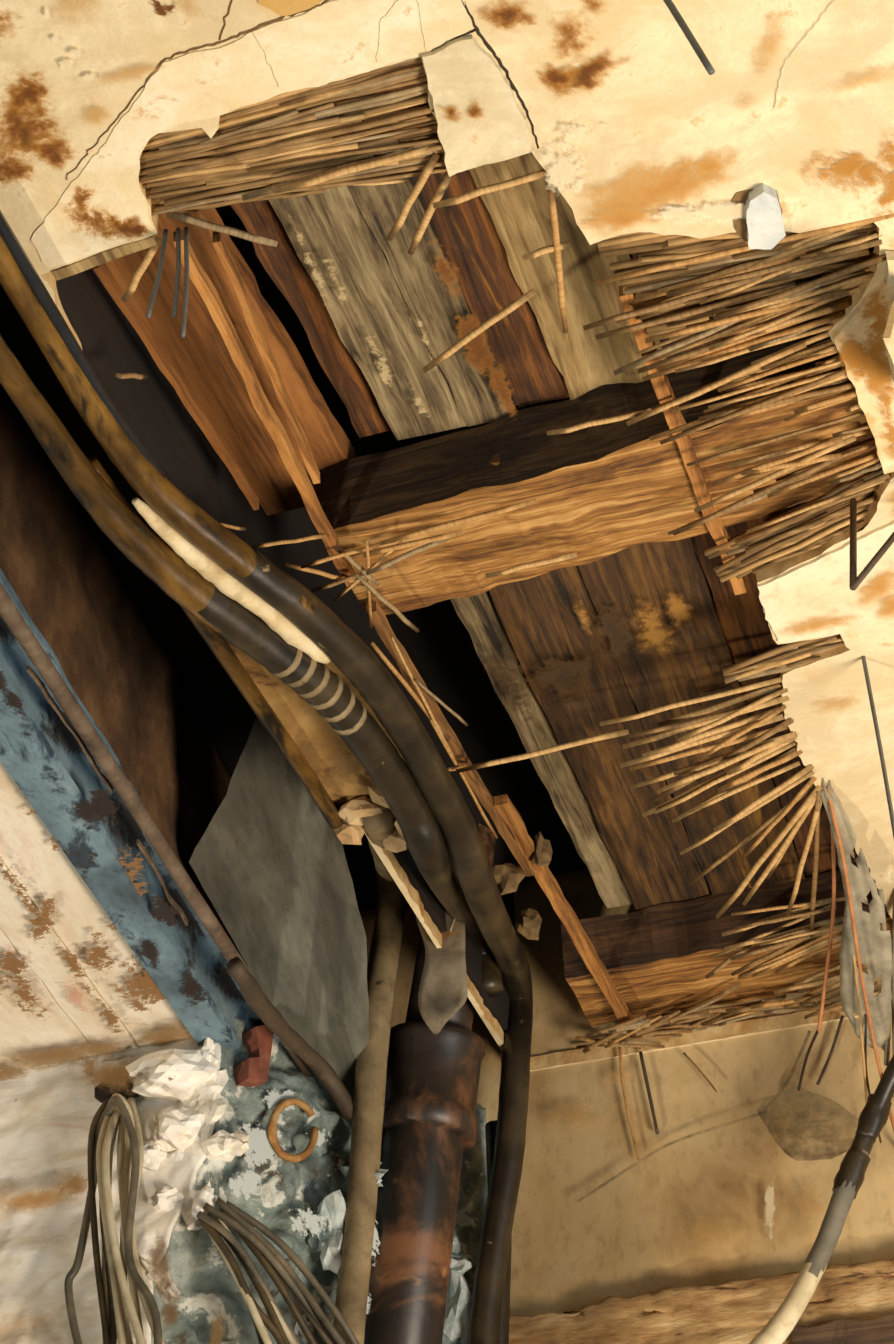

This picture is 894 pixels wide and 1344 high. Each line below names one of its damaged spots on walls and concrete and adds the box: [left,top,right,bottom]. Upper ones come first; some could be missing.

corrosion [0,73,72,183]
corrosion [150,0,176,17]
crack [66,0,329,180]
crack [376,0,539,149]
corrosion [481,0,536,29]
corrosion [538,21,616,97]
spalling [730,183,787,250]
flaking render [833,277,894,474]
flaking render [757,521,894,643]
corrosion [75,788,154,856]
spalling [94,1037,250,1171]
spalling [509,1272,800,1344]